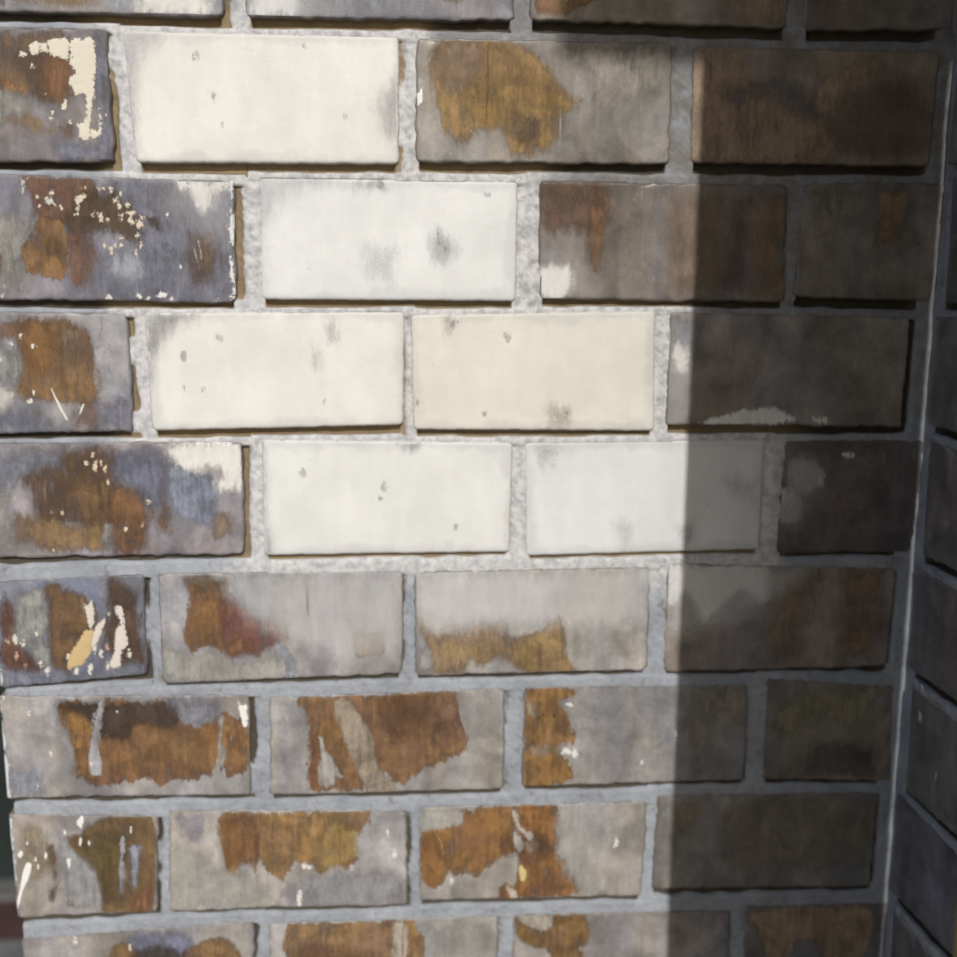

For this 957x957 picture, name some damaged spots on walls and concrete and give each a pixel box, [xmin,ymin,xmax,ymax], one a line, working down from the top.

peeling [19,36,107,141]
peeling [74,186,145,255]
peeling [84,453,109,485]
peeling [5,630,51,676]
peeling [66,600,131,675]
peeling [54,697,250,788]
peeling [297,691,469,793]
peeling [170,811,406,908]
peeling [420,804,597,898]
peeling [282,919,486,957]
peeling [515,914,590,957]